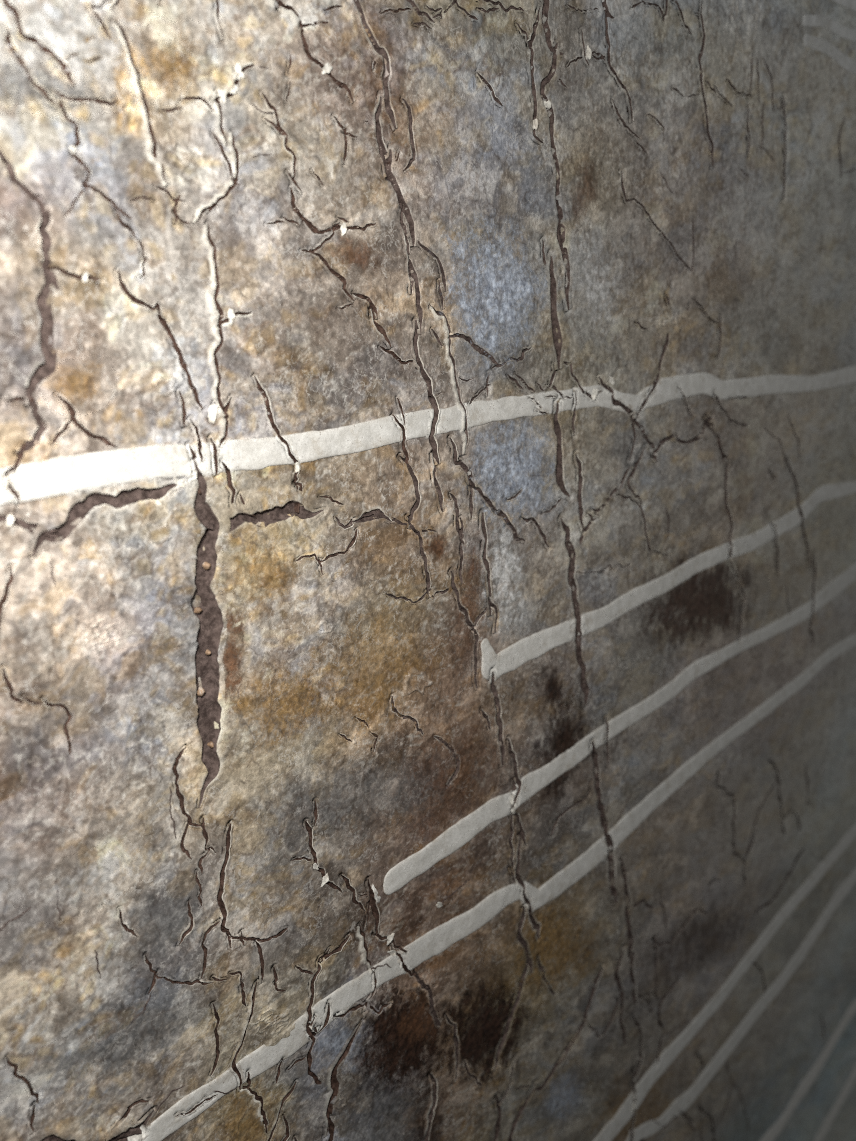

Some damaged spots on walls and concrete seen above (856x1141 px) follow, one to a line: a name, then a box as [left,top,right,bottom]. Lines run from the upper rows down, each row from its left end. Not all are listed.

crack [631,0,789,200]
crack [838,116,856,177]
crack [0,0,484,1141]
crack [251,0,750,1071]
damp [647,564,751,647]
crack [764,415,819,642]
crack [491,716,749,1141]
crack [716,759,814,914]
damp [319,980,529,1141]